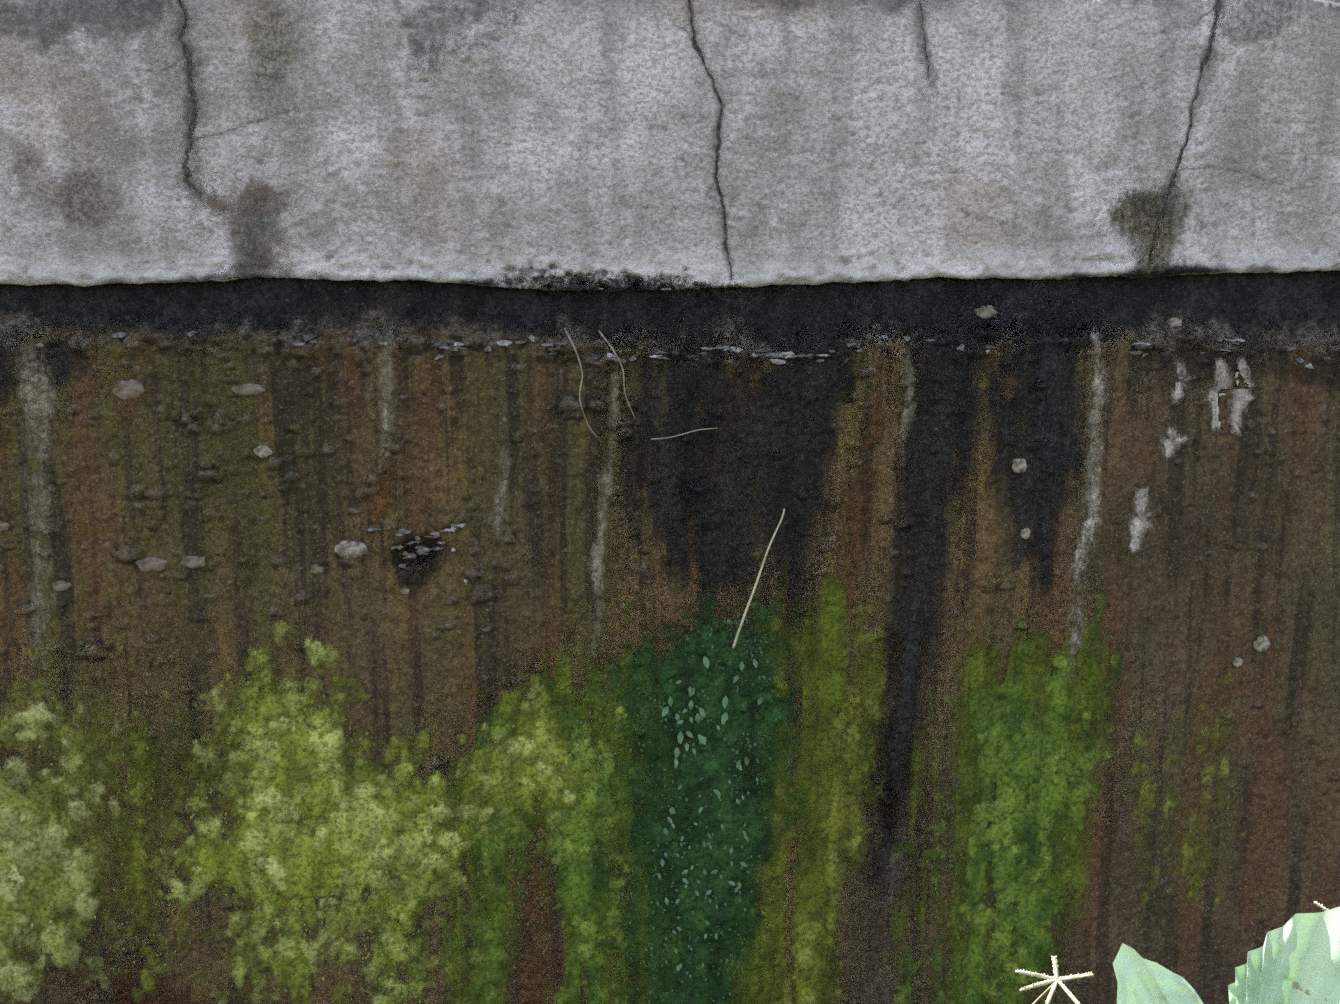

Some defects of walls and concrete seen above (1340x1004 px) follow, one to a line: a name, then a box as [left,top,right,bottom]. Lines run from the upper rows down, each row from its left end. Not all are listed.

crack [148,0,295,192]
crack [674,0,732,280]
crack [920,5,931,85]
crack [1149,0,1297,265]
damp [0,181,1340,954]